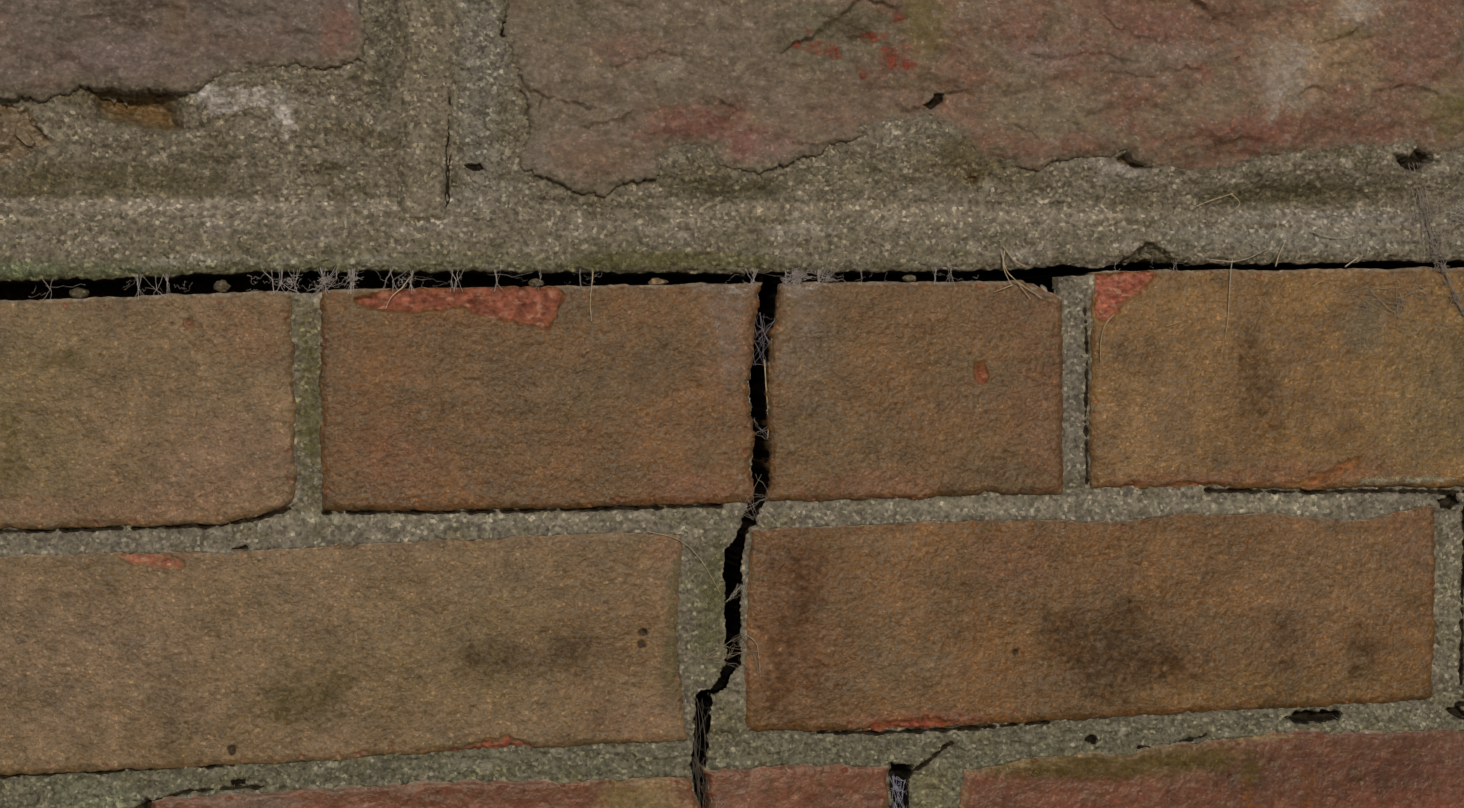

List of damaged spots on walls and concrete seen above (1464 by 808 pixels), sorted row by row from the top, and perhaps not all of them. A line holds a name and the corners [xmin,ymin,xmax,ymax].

spalling [354,286,566,330]
spalling [1093,242,1176,323]
crack [0,260,1464,808]